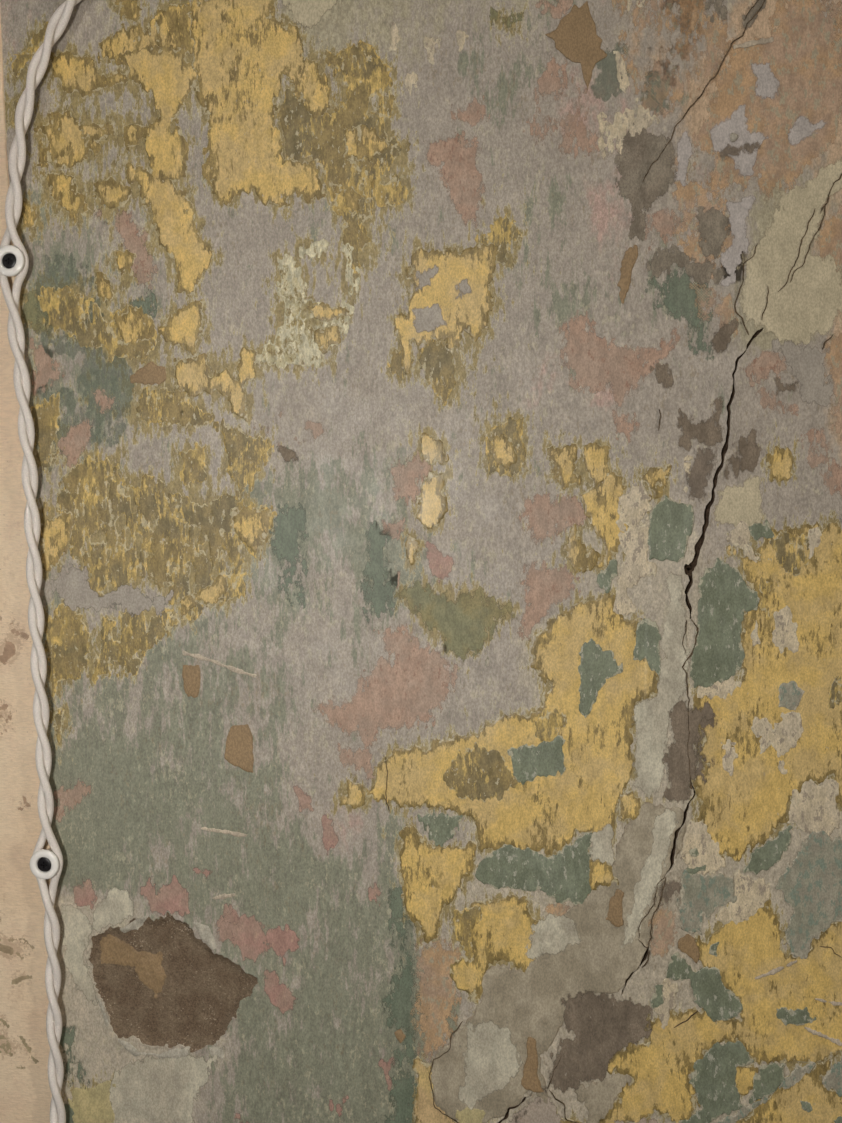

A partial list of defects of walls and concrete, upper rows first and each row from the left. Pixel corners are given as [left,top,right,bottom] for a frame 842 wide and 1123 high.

peeling [545,1,630,93]
crack [643,0,765,181]
flaking render [614,123,731,304]
peeling [9,0,420,743]
peeling [416,433,449,530]
crack [622,173,842,992]
peeling [662,520,842,876]
peeling [339,593,658,1123]
flaking render [89,912,296,1059]
crack [429,1021,463,1123]
crack [498,1058,579,1123]
peeling [521,899,842,1123]